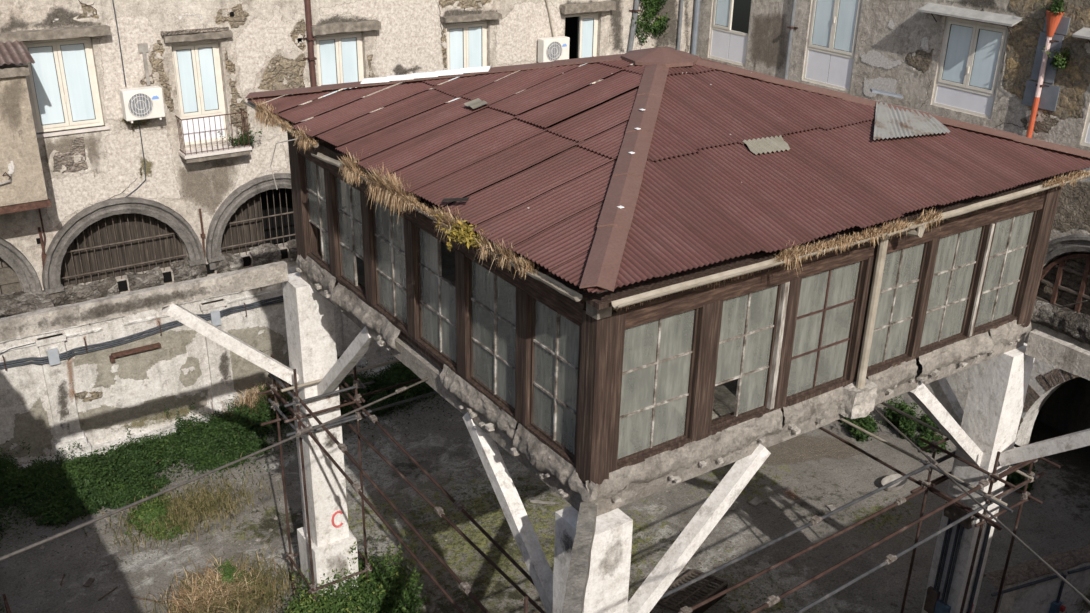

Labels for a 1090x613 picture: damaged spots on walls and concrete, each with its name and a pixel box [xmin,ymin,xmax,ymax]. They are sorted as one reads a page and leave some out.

peeling [319,0,495,78]
peeling [495,0,564,65]
peeling [46,0,181,230]
peeling [210,0,309,190]
peeling [1051,178,1090,237]
peeling [71,327,211,433]